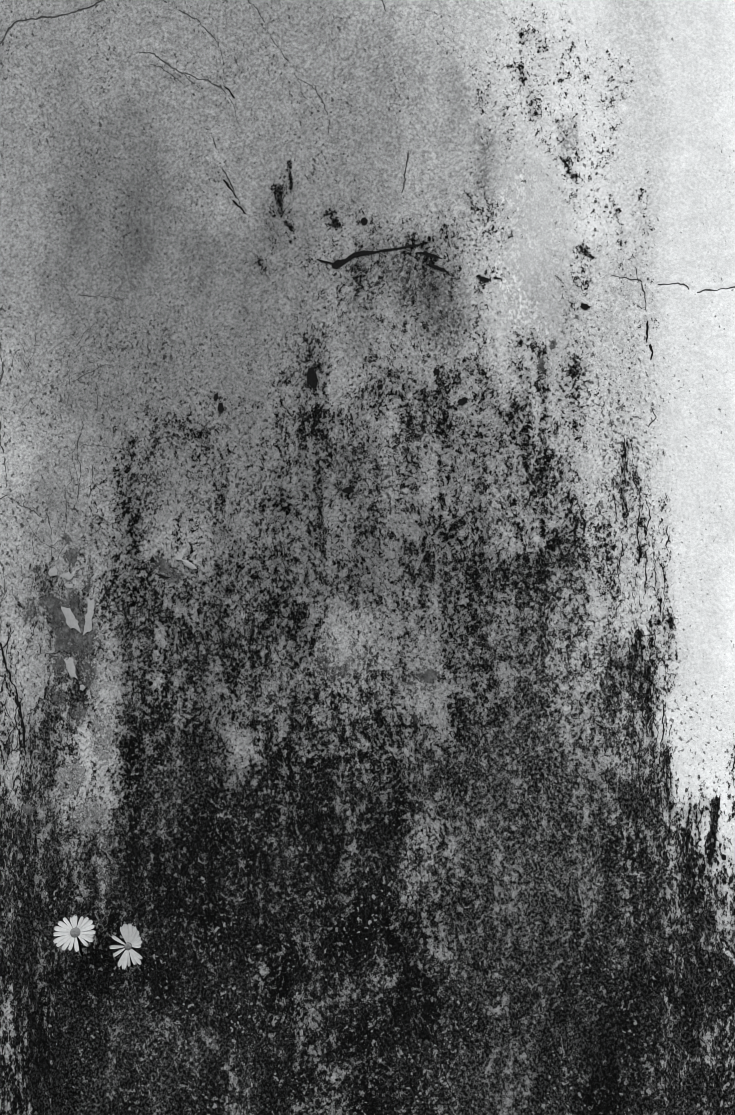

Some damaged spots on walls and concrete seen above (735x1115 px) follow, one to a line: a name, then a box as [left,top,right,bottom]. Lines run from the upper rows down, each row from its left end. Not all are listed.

crack [0,0,103,44]
crack [140,0,237,120]
crack [212,137,246,214]
leakage [284,235,342,293]
crack [611,267,735,360]
crack [0,324,114,916]
peeling [23,531,114,769]
peeling [56,759,110,920]